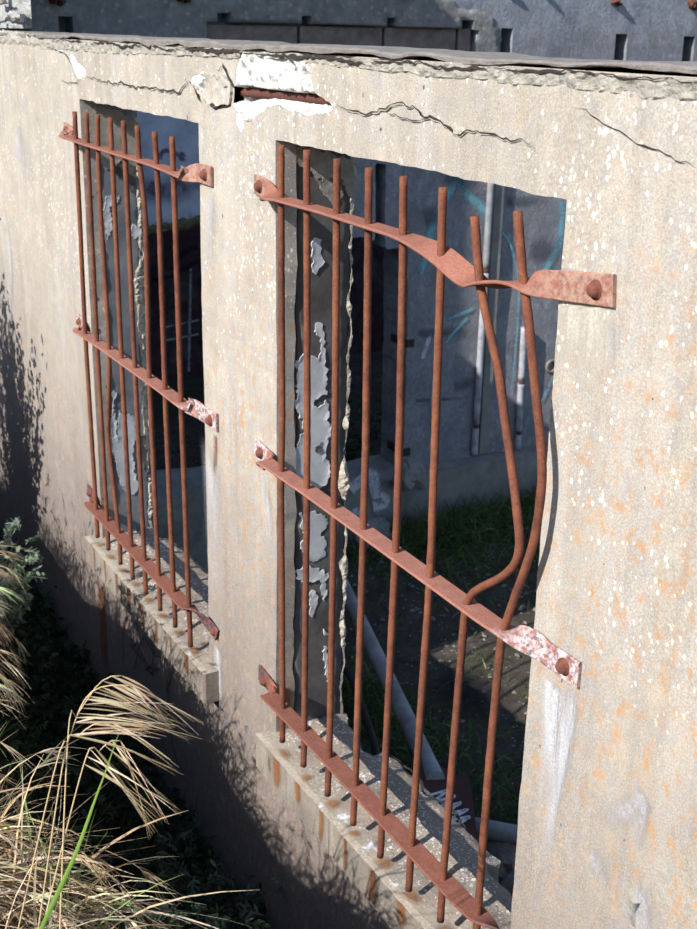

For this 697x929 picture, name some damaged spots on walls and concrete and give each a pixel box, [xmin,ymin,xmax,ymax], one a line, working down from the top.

flaking render [0,0,502,52]
crack [16,35,240,100]
spalling [191,53,333,131]
crack [261,52,697,83]
crack [338,101,534,148]
crack [576,107,691,165]
peeling [293,144,357,507]
corrosion [84,543,139,607]
spalling [339,526,348,714]
corrosion [274,750,287,784]
corrosion [319,800,338,835]
corrosion [369,859,390,901]